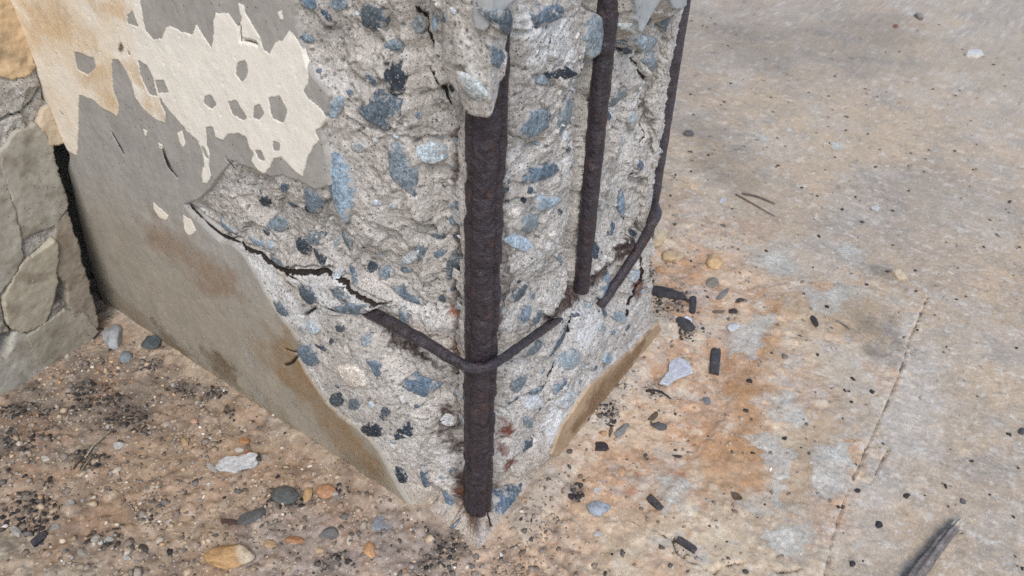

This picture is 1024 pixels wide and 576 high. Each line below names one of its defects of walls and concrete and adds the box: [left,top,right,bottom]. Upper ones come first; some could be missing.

crack [190,204,387,316]
spalling [11,0,693,549]
corrosion [590,235,636,286]
corrosion [541,281,579,322]
corrosion [388,330,434,364]
corrosion [436,405,464,452]
corrosion [454,469,478,529]